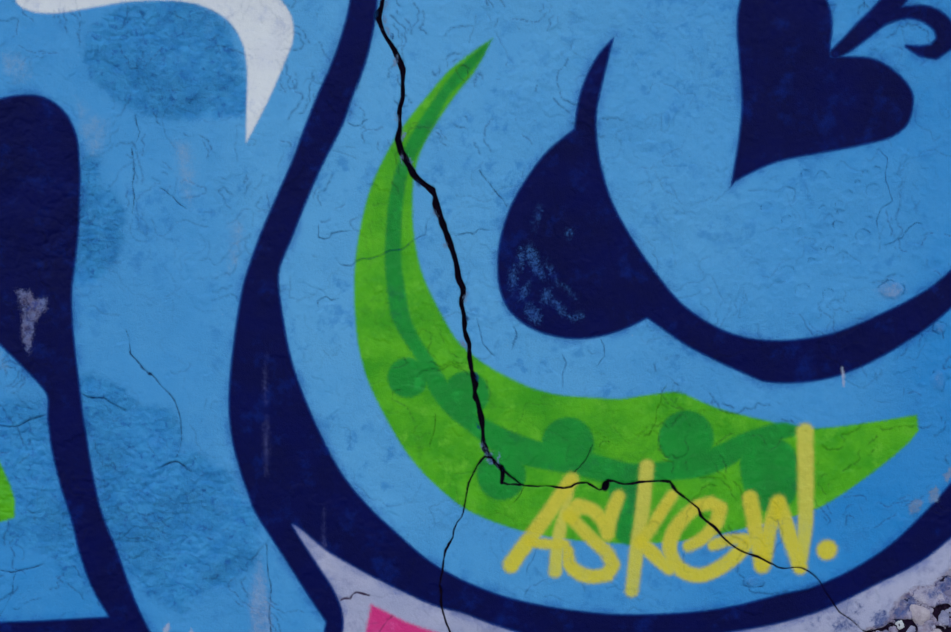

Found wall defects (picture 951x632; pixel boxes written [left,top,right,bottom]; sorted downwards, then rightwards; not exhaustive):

crack [373,0,866,632]
peeling [908,466,951,515]
spalling [806,566,951,632]